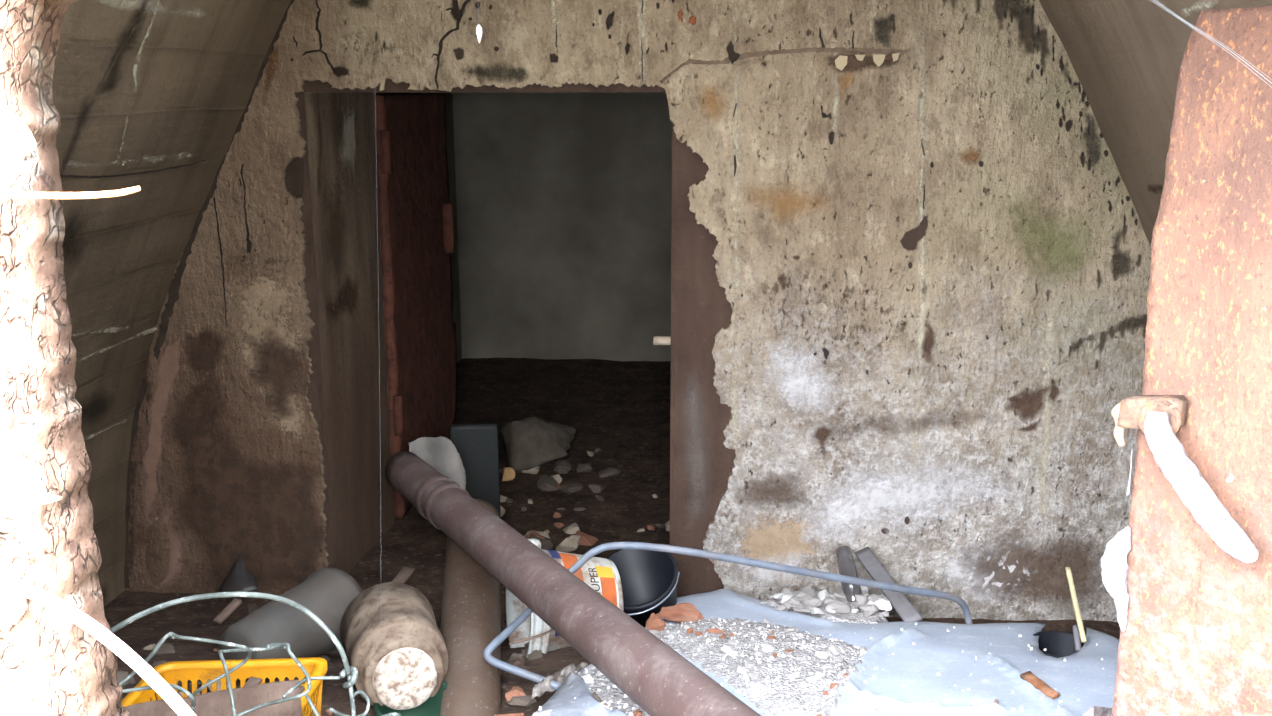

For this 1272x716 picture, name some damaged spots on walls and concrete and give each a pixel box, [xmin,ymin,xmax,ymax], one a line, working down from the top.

crack [291,0,334,72]
crack [431,0,471,89]
crack [660,28,910,84]
leakage [976,0,1108,171]
leakage [1097,177,1141,288]
spalling [669,119,736,598]
peeling [142,340,184,588]
leakage [174,336,319,586]
peeling [732,513,819,587]